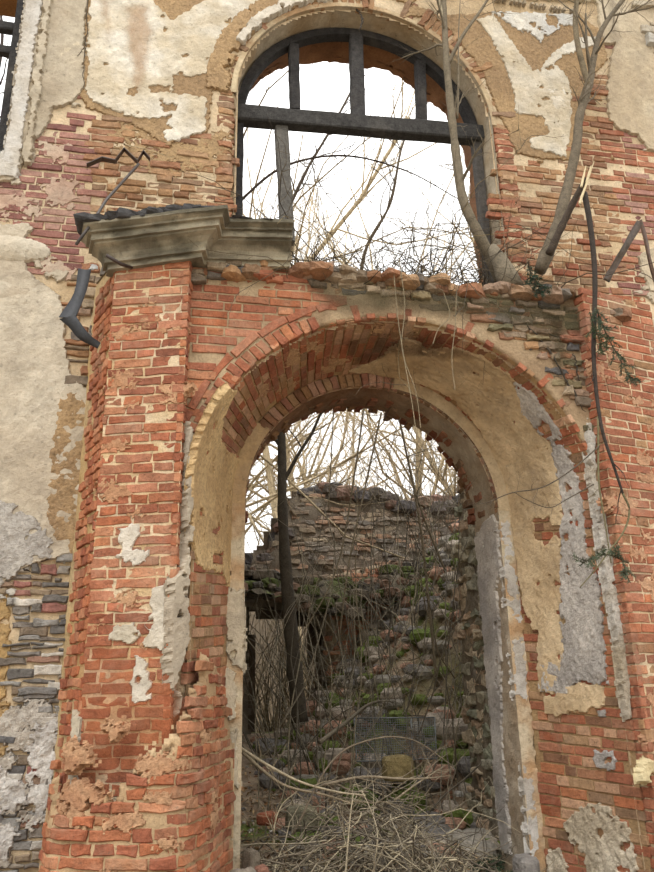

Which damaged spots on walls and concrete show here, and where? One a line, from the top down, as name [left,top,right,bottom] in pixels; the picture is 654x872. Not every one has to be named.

spalling [400,0,654,304]
flaking render [0,0,389,872]
flaking render [283,331,654,872]